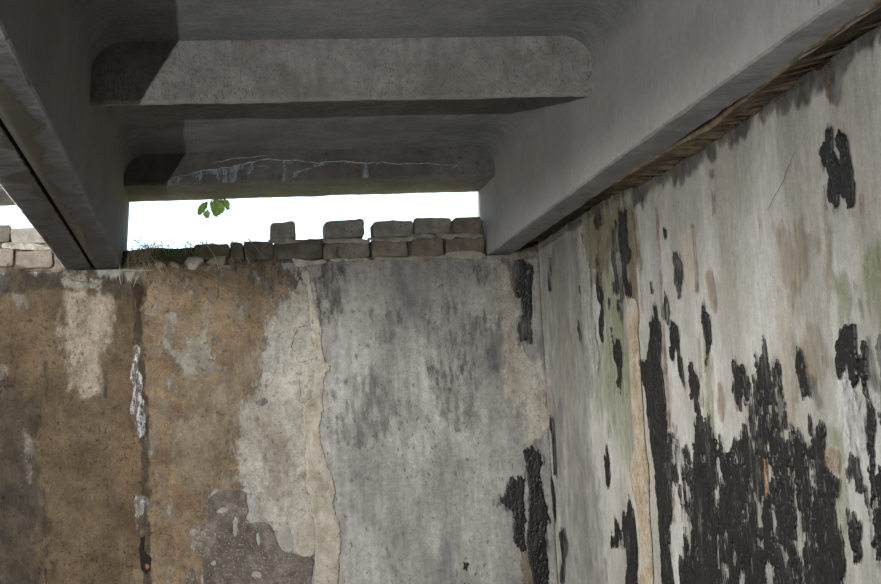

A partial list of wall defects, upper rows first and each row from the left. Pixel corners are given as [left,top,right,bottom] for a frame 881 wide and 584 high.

peeling [818,125,854,213]
crack [131,282,142,337]
crack [136,360,151,584]
leakage [0,45,343,584]
peeling [512,259,534,344]
peeling [497,416,568,584]
peeling [595,207,881,584]